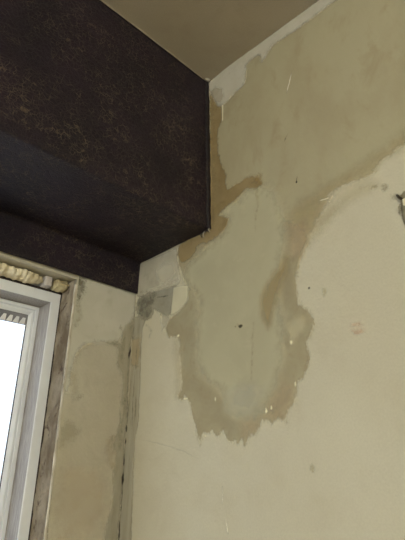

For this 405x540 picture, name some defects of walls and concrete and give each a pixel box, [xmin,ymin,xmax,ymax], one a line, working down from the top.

peeling [210,0,405,243]
peeling [171,286,188,315]
leakage [166,95,313,445]